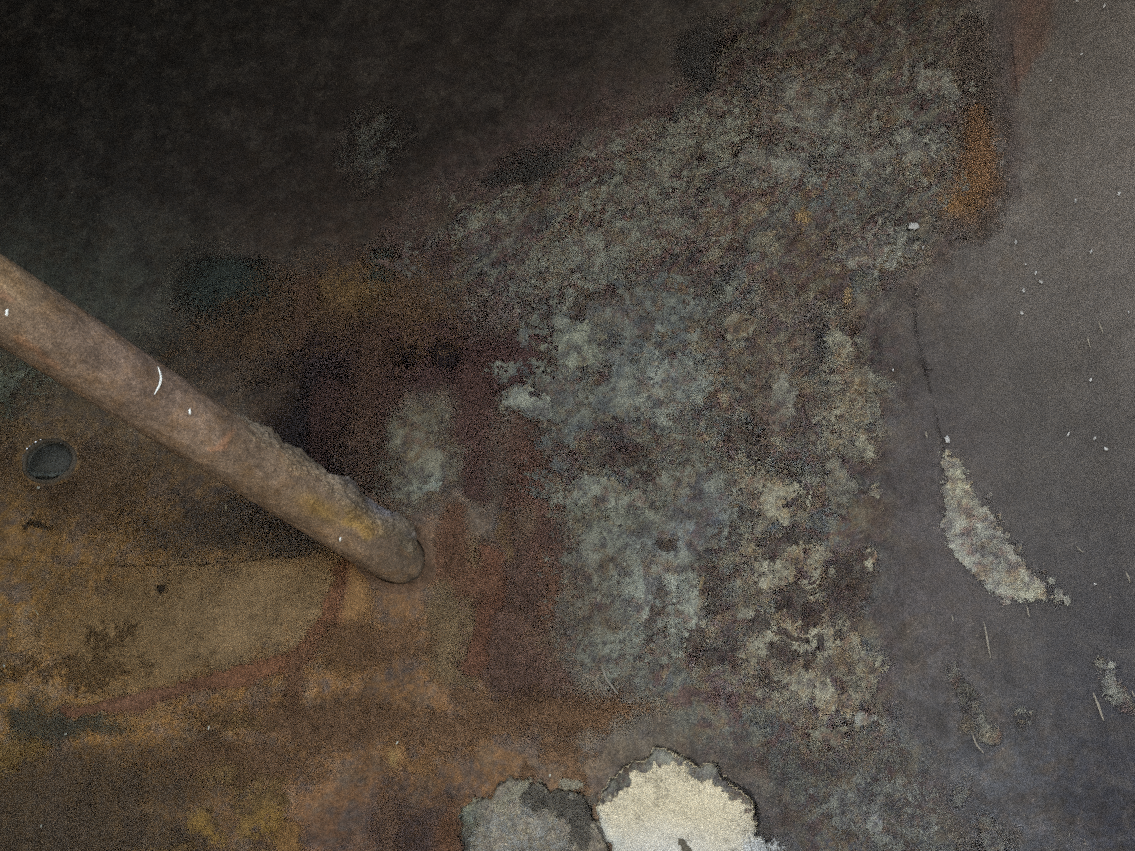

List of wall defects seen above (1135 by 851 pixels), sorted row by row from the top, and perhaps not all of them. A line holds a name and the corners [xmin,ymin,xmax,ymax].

corrosion [931,14,1011,245]
corrosion [433,410,617,758]
peeling [366,0,1006,851]
spalling [938,449,1071,606]
peeling [945,662,1034,748]
corrosion [370,798,464,851]